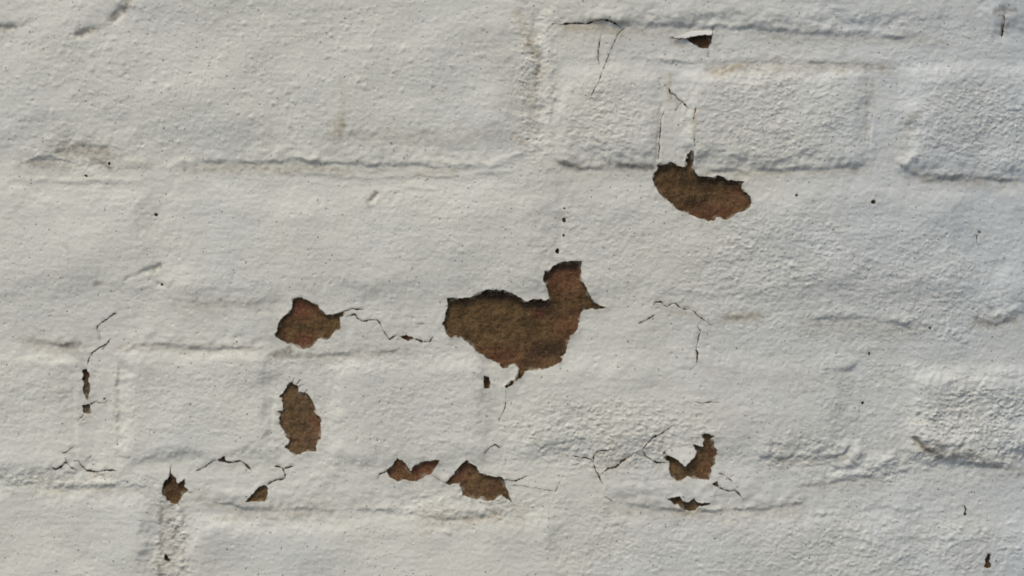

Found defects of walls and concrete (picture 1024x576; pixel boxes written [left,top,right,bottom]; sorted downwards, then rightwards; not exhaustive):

crack [552,19,630,99]
peeling [652,150,752,221]
peeling [274,297,345,349]
crack [343,308,433,342]
peeling [442,261,605,388]
crack [639,301,705,369]
peeling [278,381,322,455]
crack [52,446,116,475]
crack [160,460,293,494]
peeling [445,460,512,502]
crack [574,425,673,501]
peeling [662,433,719,487]